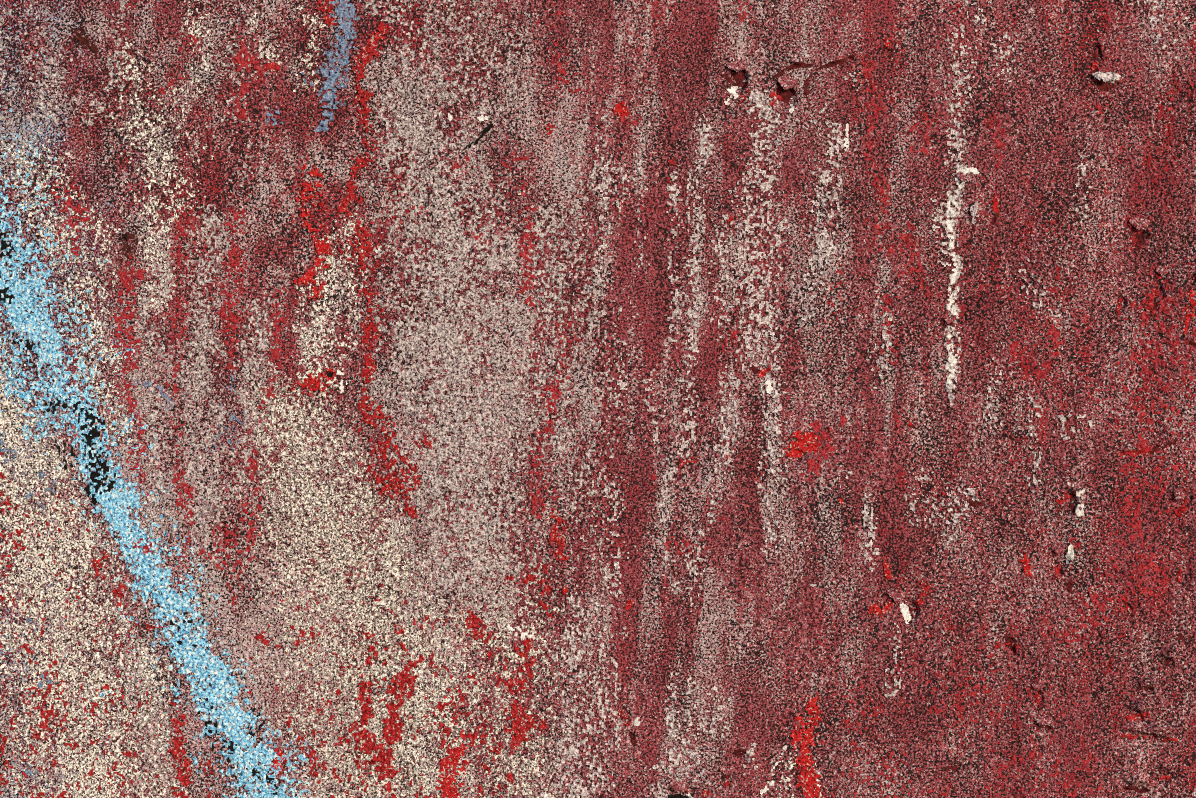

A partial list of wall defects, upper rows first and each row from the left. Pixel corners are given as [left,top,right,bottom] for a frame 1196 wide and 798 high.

spalling [722,60,799,116]
spalling [668,749,747,798]